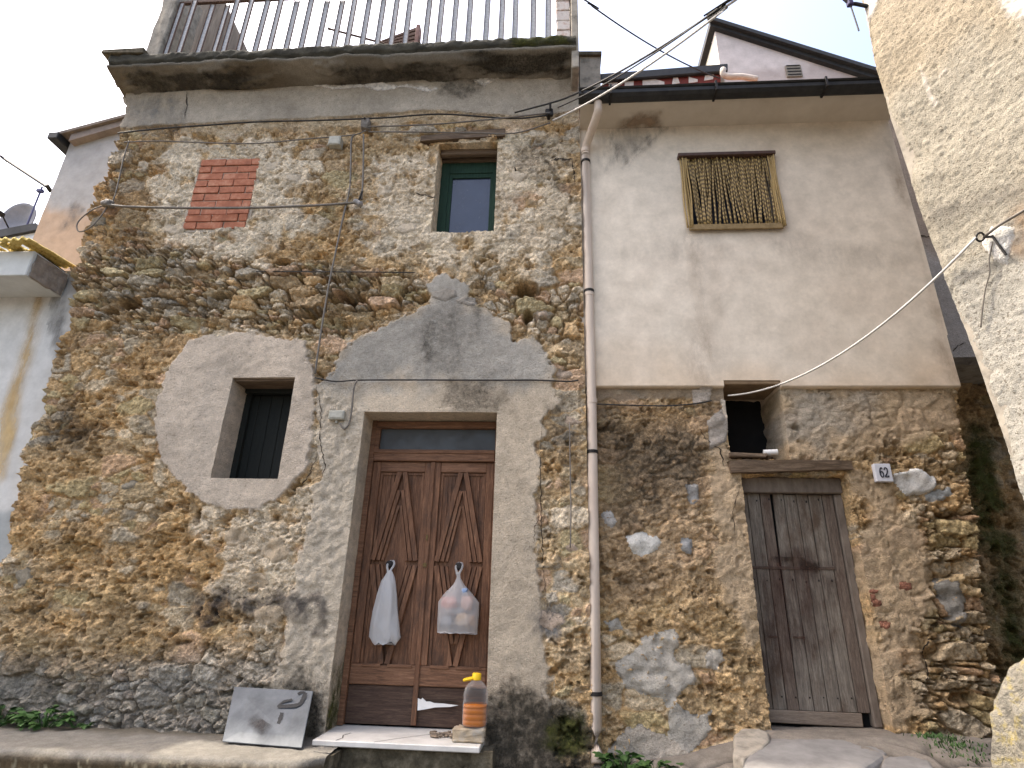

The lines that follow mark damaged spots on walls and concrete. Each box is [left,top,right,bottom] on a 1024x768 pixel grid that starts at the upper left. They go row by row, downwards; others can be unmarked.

leakage [337,50,569,93]
leakage [622,115,657,128]
corrosion [0,377,21,472]
leakage [485,678,593,768]